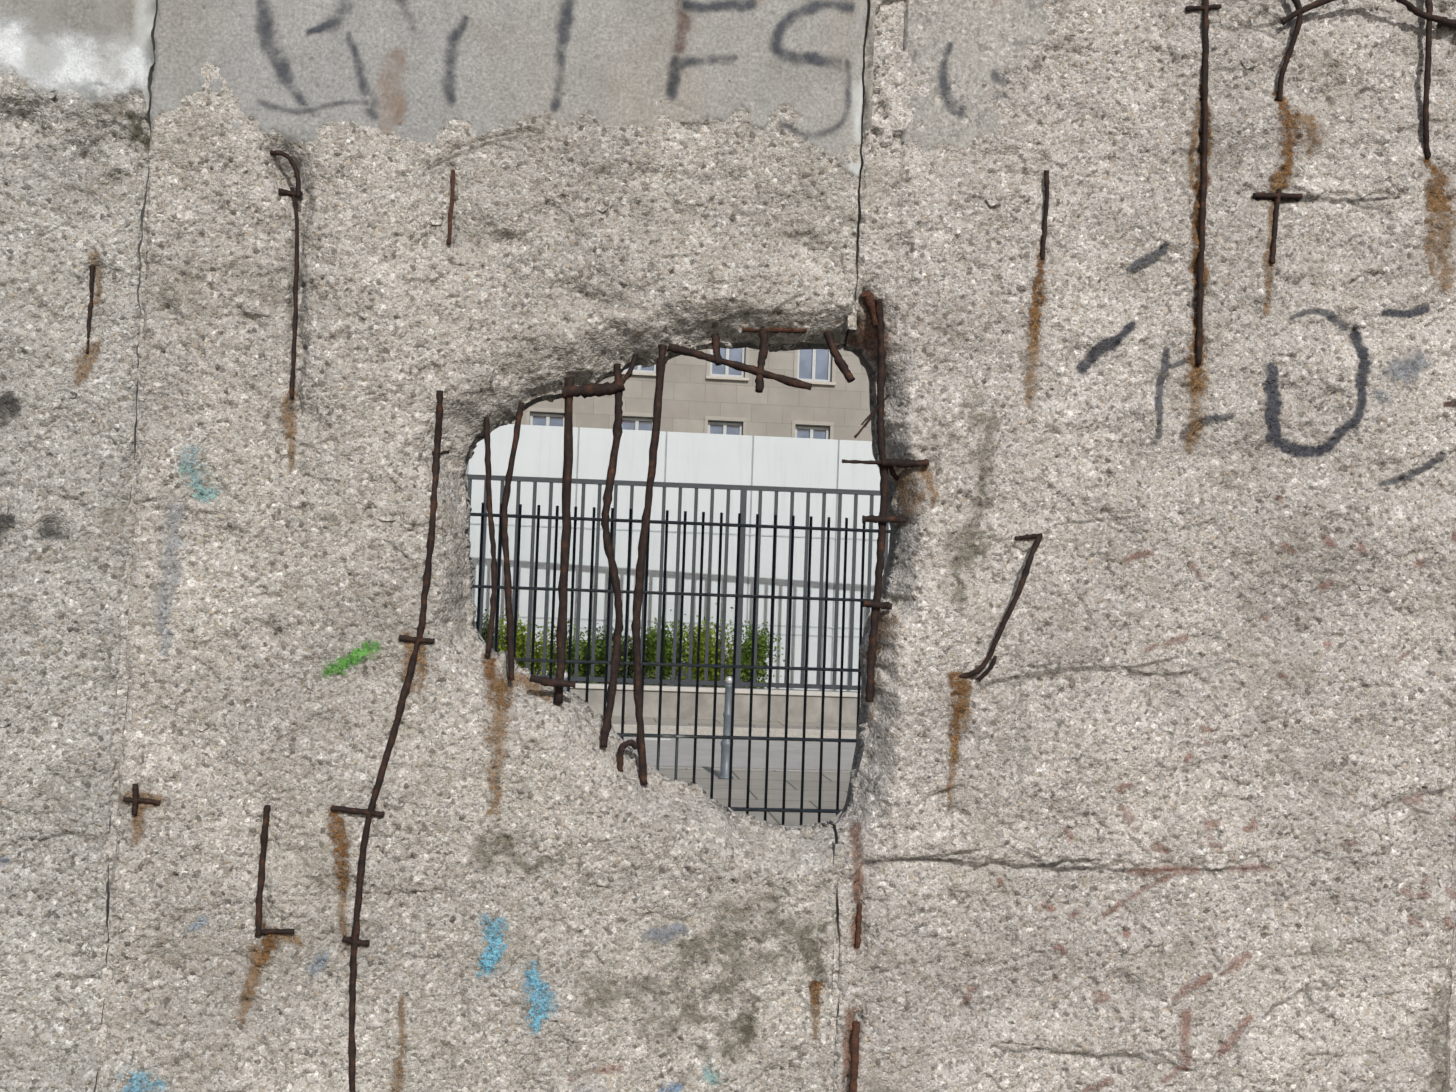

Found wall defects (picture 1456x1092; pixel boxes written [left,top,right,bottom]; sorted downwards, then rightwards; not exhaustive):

leakage [0,21,154,108]
leakage [128,111,150,153]
rust [1025,253,1046,408]
rust [1185,84,1213,454]
rust [1263,91,1321,316]
rust [1423,158,1456,291]
spalling [0,62,861,1092]
rust [482,649,551,815]
rust [946,671,972,810]
rust [327,807,350,945]
crack [940,849,1099,872]
crack [1144,866,1221,874]